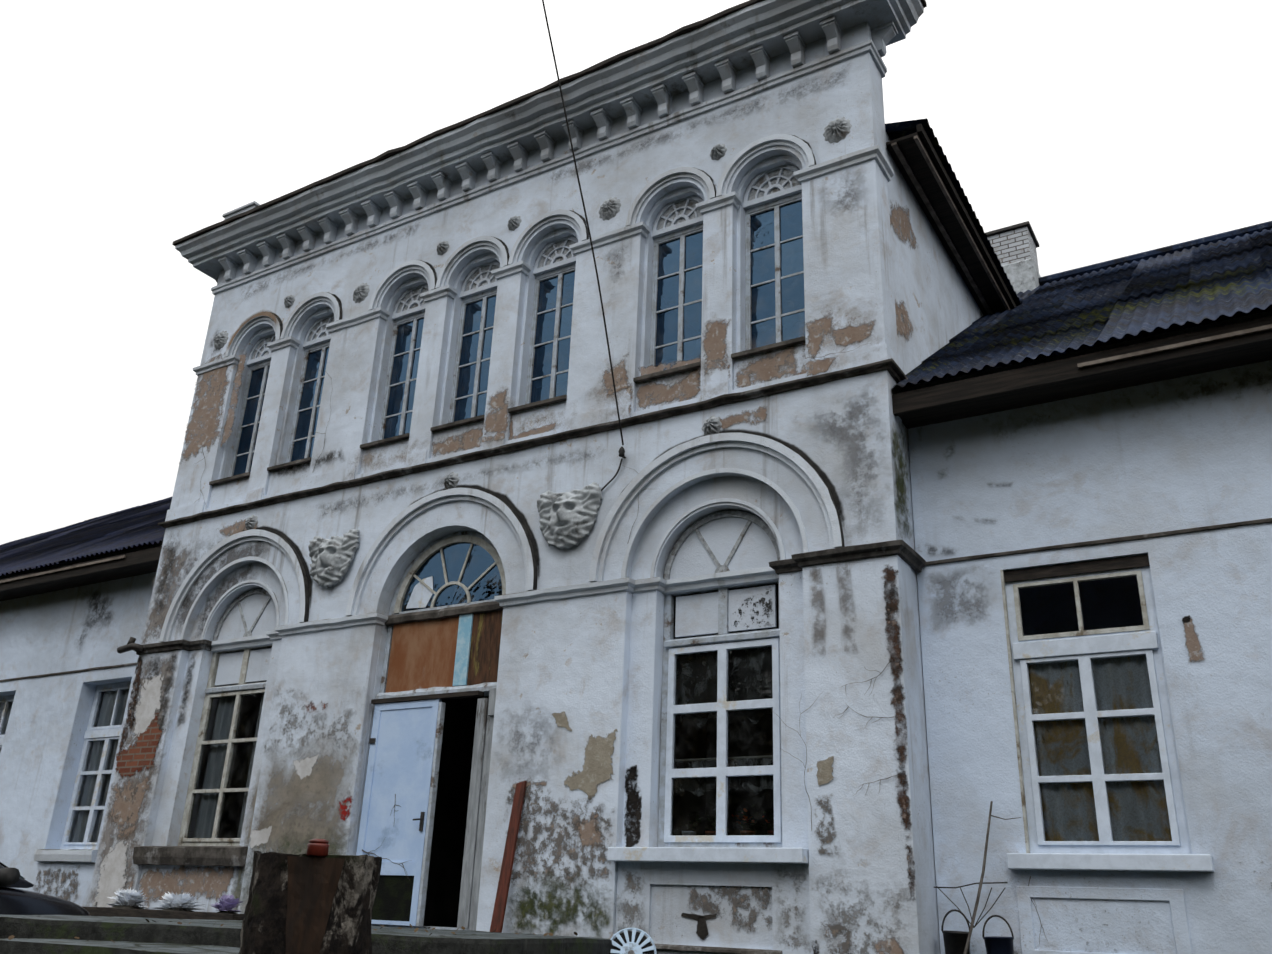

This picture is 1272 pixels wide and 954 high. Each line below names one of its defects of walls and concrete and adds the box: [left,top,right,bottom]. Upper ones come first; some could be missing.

flaking render [181,354,246,459]
flaking render [432,390,556,456]
flaking render [597,315,875,414]
water stain [653,429,844,521]
water stain [825,405,869,505]
flaking render [1182,615,1204,662]
flaking render [92,656,234,908]
water stain [232,705,353,913]
flaking render [507,729,642,890]
water stain [622,872,641,931]
water stain [689,874,805,946]
water stain [823,883,900,954]